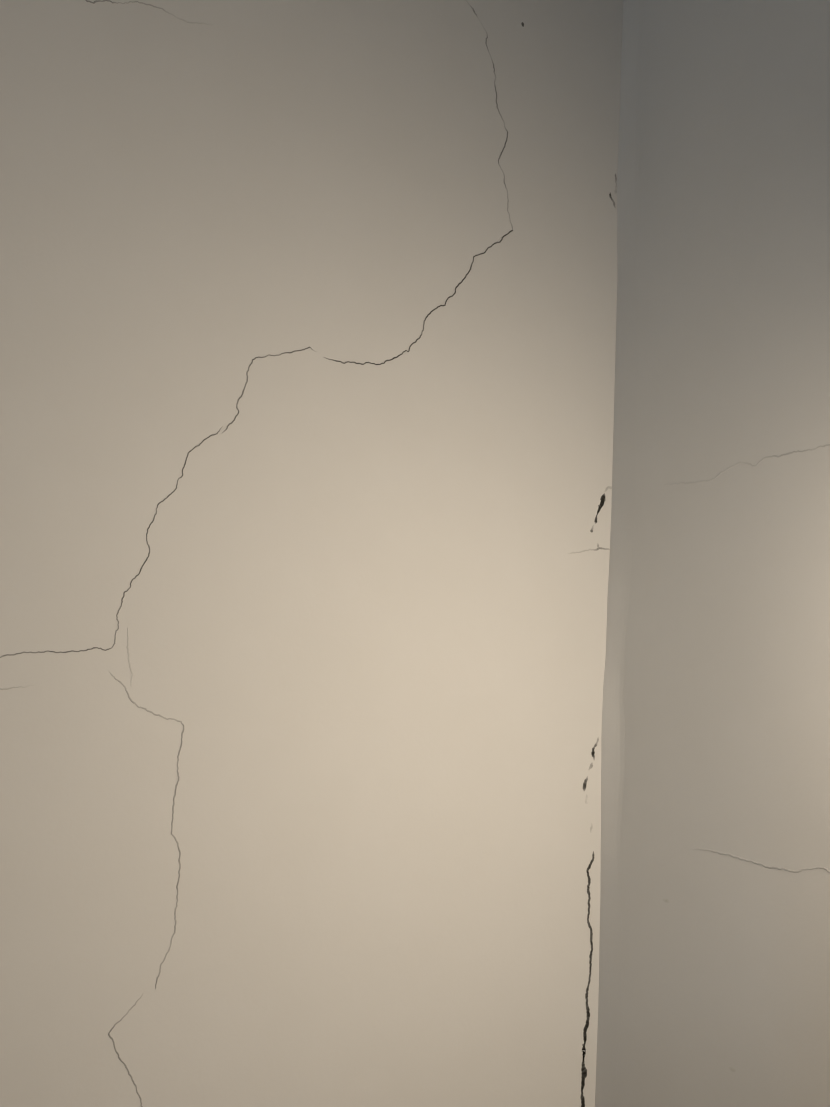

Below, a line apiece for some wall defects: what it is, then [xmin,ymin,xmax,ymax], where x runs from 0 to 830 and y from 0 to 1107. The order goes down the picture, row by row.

crack [0,0,513,1107]
crack [568,486,612,554]
crack [579,737,599,1107]